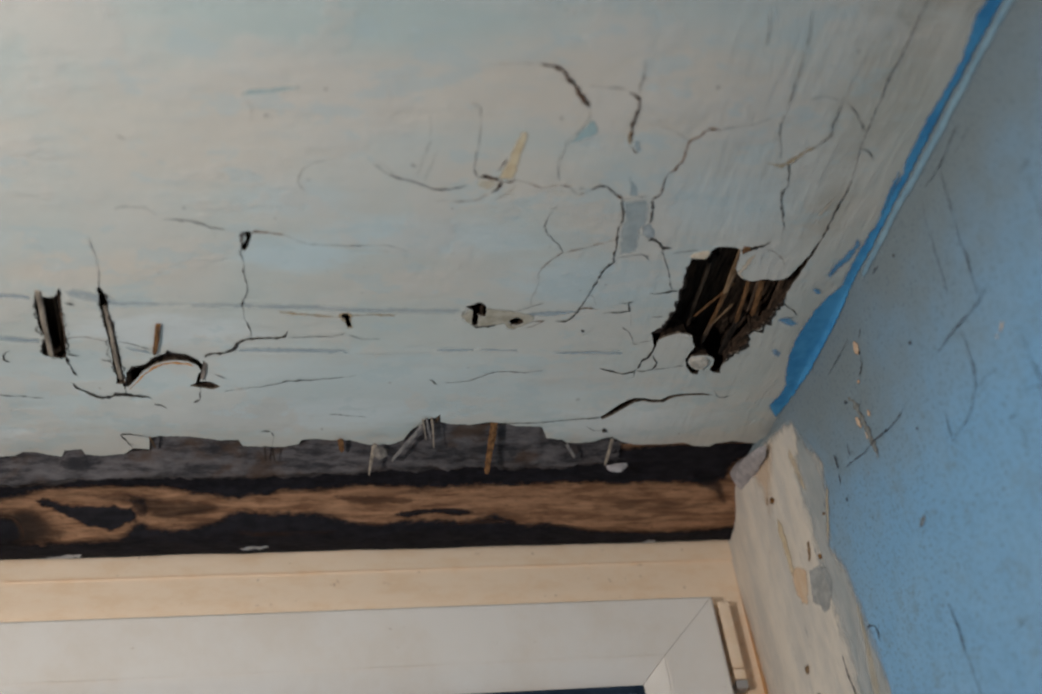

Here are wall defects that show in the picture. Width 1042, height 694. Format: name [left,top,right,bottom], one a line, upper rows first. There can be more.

crack [116,206,224,230]
crack [375,1,927,424]
hole [32,288,77,376]
flaking render [88,238,139,395]
crack [67,249,344,408]
peeling [462,302,534,329]
hole [651,239,822,374]
crack [922,127,997,443]
crack [120,434,146,452]
flaking render [0,415,629,488]
damp [0,443,754,560]
peeling [778,521,832,611]